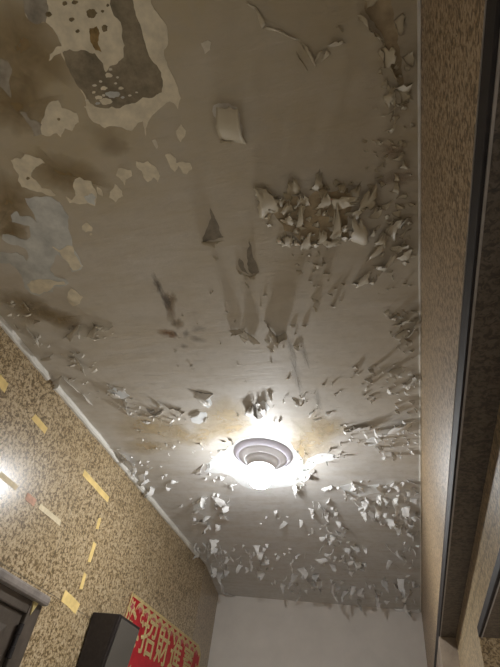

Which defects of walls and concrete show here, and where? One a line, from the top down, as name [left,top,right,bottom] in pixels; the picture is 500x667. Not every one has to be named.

peeling [246,0,417,294]
peeling [201,209,223,248]
peeling [237,241,259,291]
peeling [106,384,213,426]
peeling [237,390,273,419]
peeling [340,310,422,461]
peeling [116,449,162,499]
peeling [189,432,421,617]